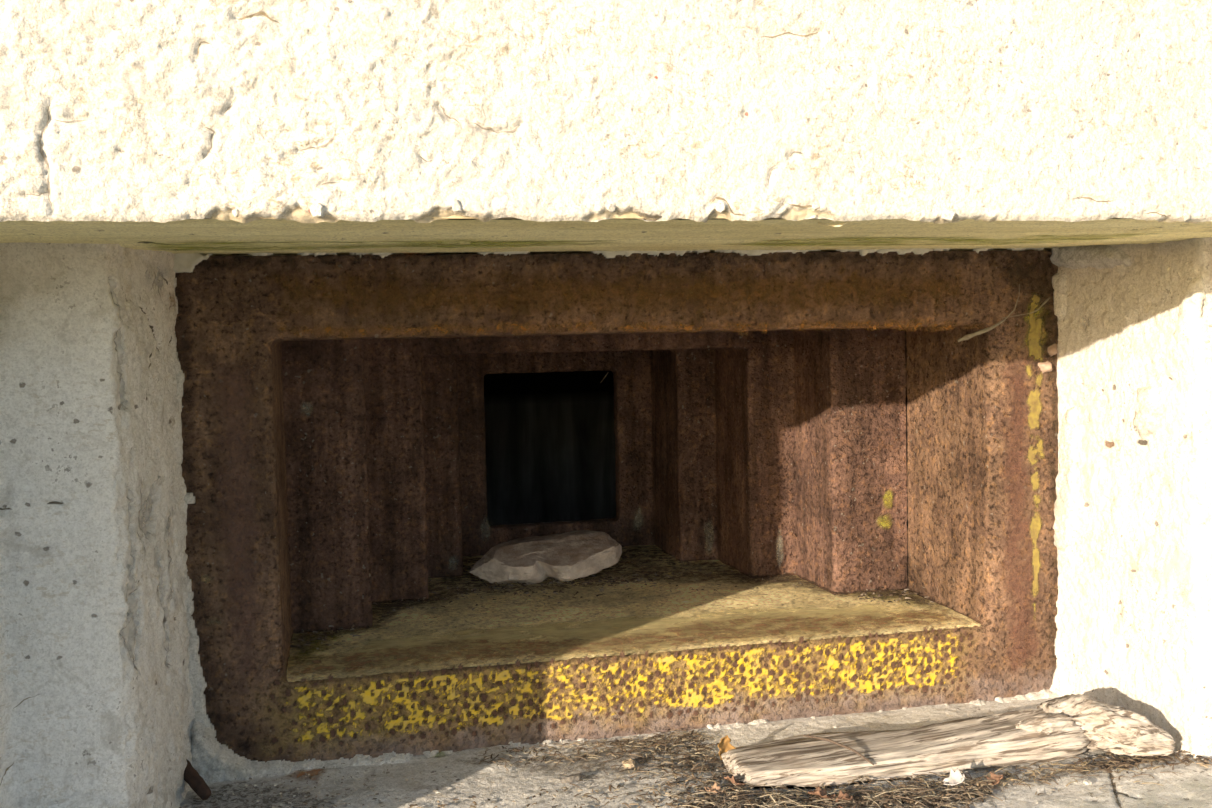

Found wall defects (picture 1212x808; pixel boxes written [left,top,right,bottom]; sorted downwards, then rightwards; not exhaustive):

crack [26,103,85,208]
damp [731,235,1108,246]
corrosion [794,319,956,332]
corrosion [991,252,1059,380]
corrosion [181,389,192,430]
corrosion [290,610,962,675]
corrosion [203,690,231,730]